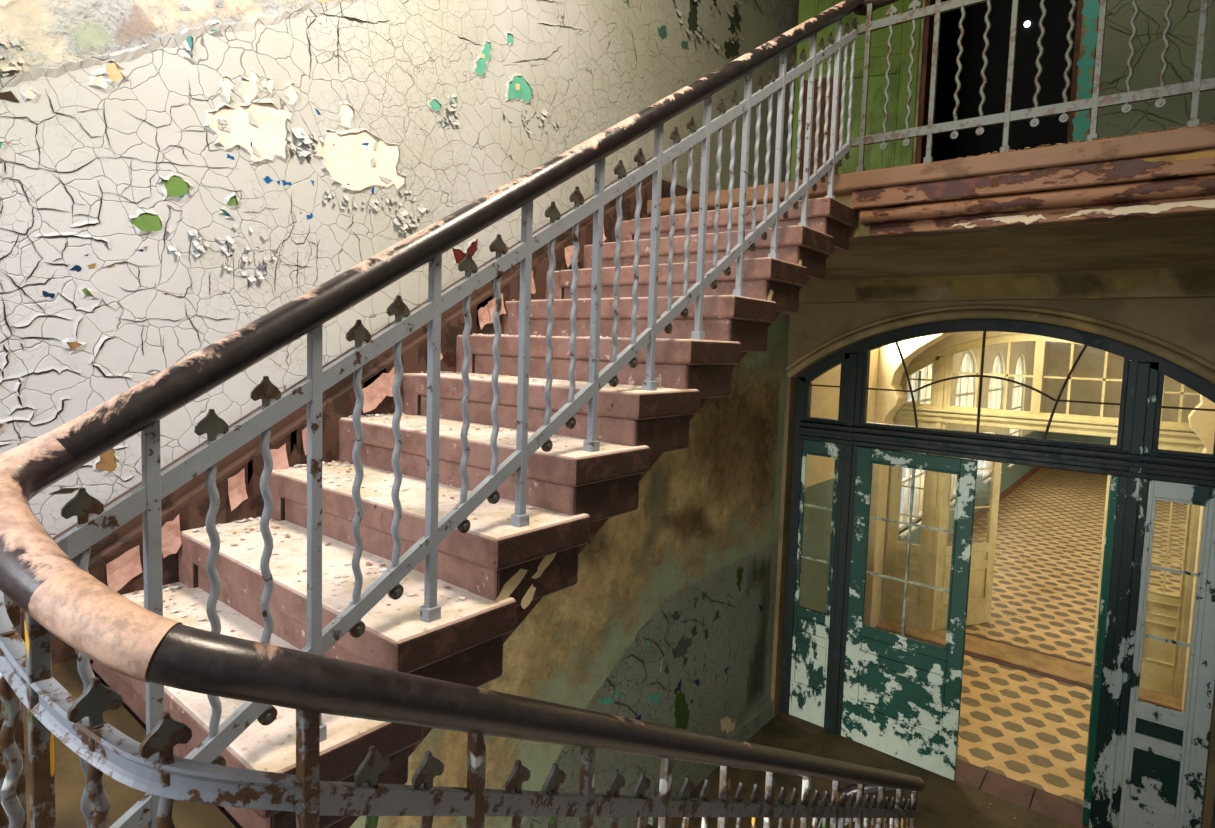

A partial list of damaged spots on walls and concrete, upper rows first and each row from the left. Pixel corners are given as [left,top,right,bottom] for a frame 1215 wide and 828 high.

peeling [0,0,358,103]
crack [306,0,409,80]
crack [1098,15,1194,126]
peeling [203,67,430,237]
crack [0,83,320,446]
peeling [126,170,276,283]
peeling [952,200,1215,228]
crack [79,444,133,482]
water stain [481,356,780,698]
water stain [405,729,468,788]
water stain [485,735,515,789]
water stain [382,816,457,828]